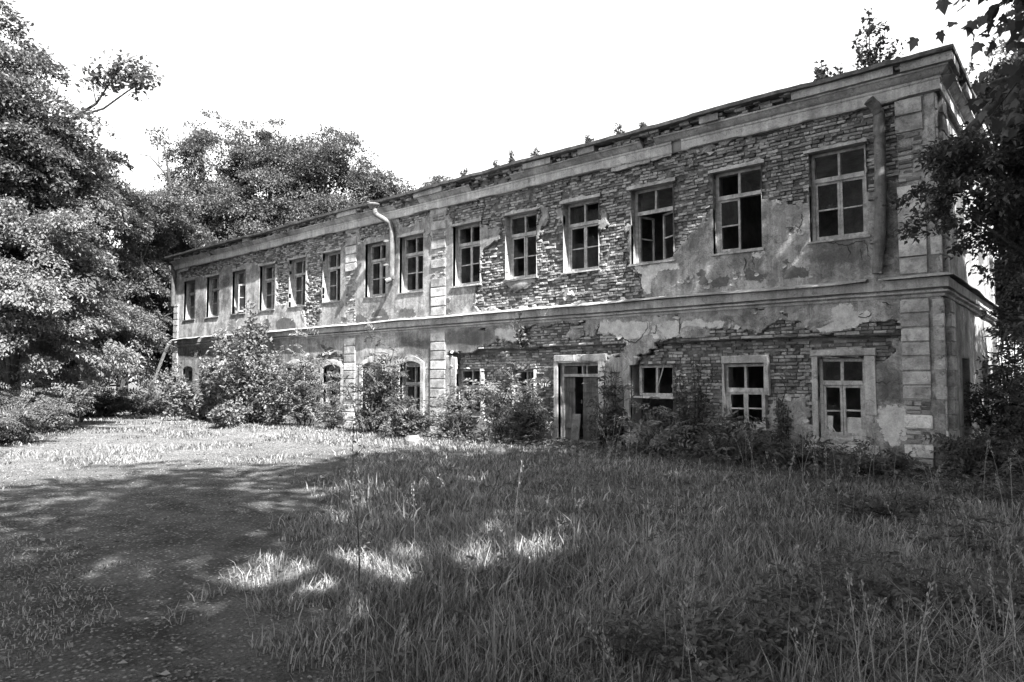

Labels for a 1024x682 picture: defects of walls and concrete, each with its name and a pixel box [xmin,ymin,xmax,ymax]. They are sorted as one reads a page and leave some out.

spalling [181,99,923,331]
spalling [450,303,902,437]